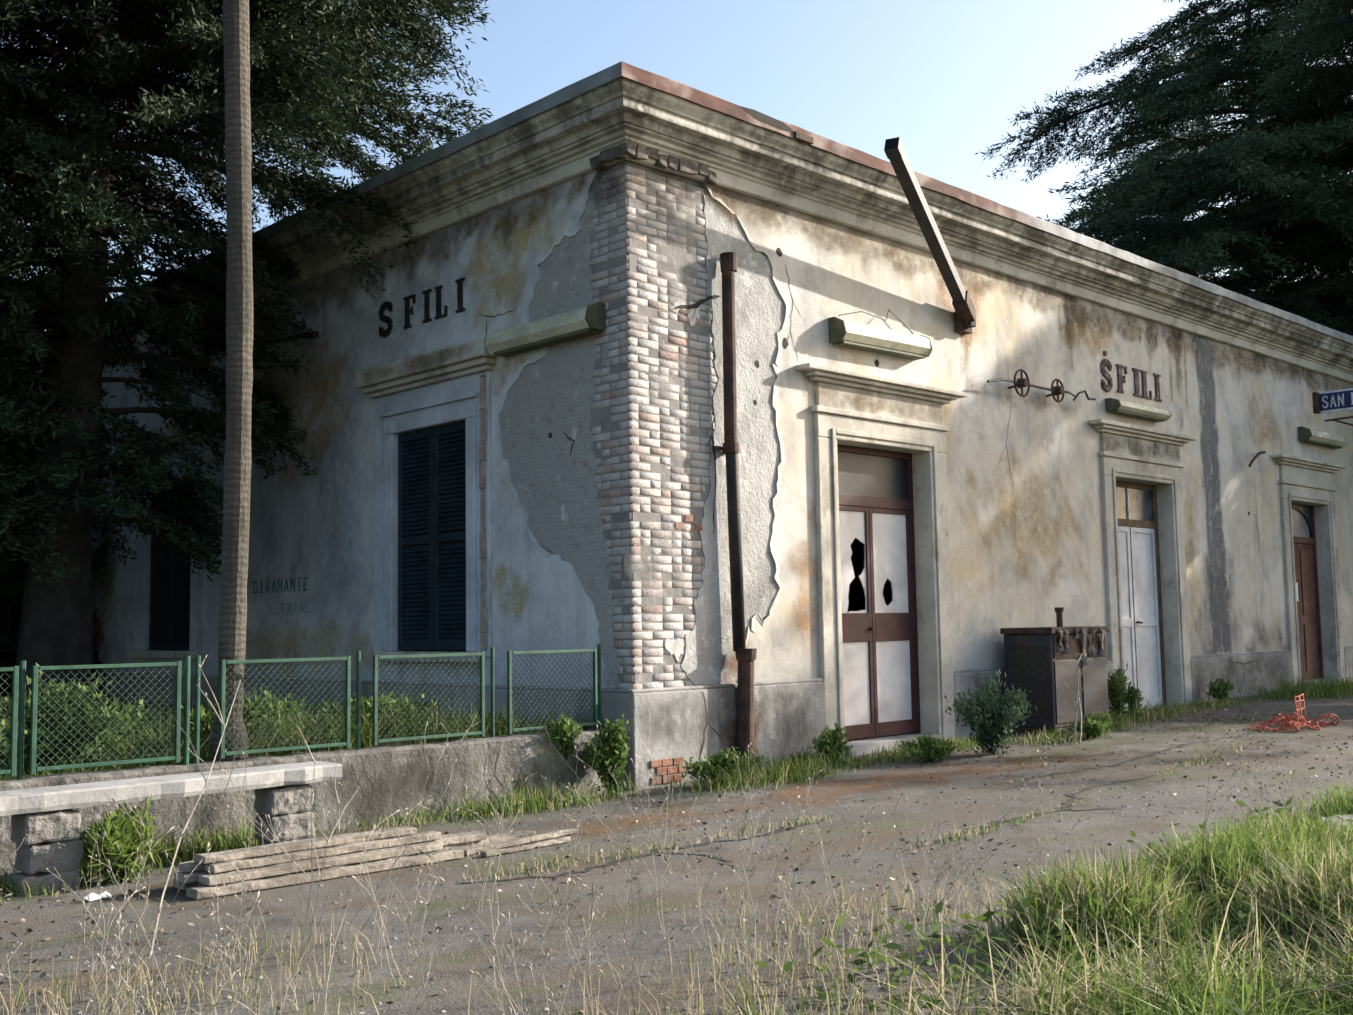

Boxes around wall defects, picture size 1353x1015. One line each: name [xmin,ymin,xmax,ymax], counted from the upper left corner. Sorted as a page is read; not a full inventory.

water stain [469,189,547,298]
water stain [804,220,916,272]
flaking render [479,142,789,689]
water stain [1062,296,1344,654]
crack [700,692,721,762]